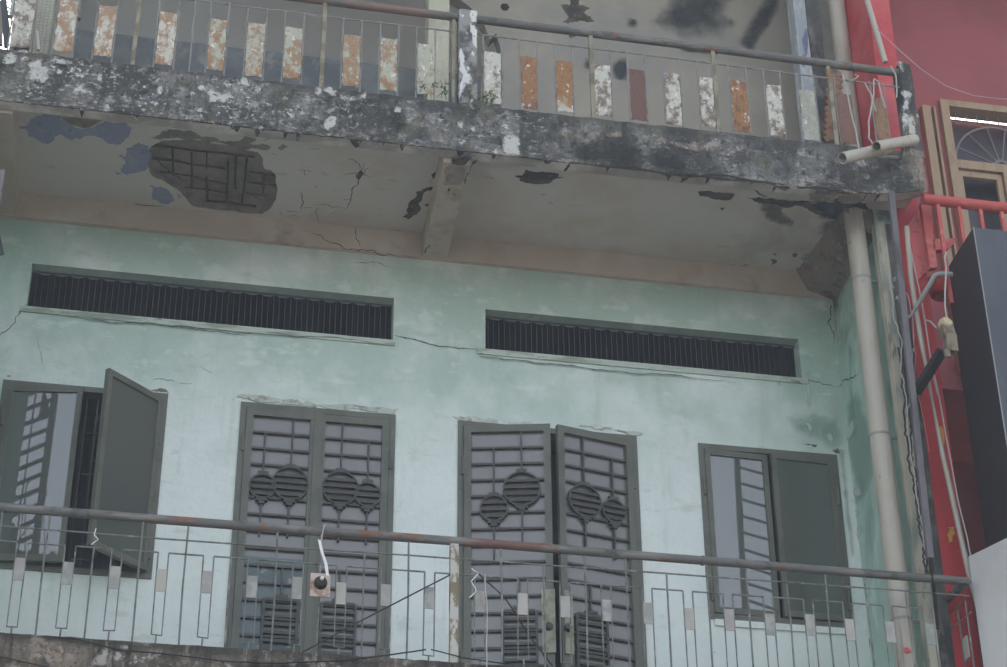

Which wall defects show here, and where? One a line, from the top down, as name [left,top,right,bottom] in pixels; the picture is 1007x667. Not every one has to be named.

leakage [742,0,776,48]
spalling [19,114,288,214]
crack [262,128,401,266]
flaking render [403,121,477,219]
peeling [486,124,520,155]
flaking render [516,170,562,184]
leakage [576,141,683,170]